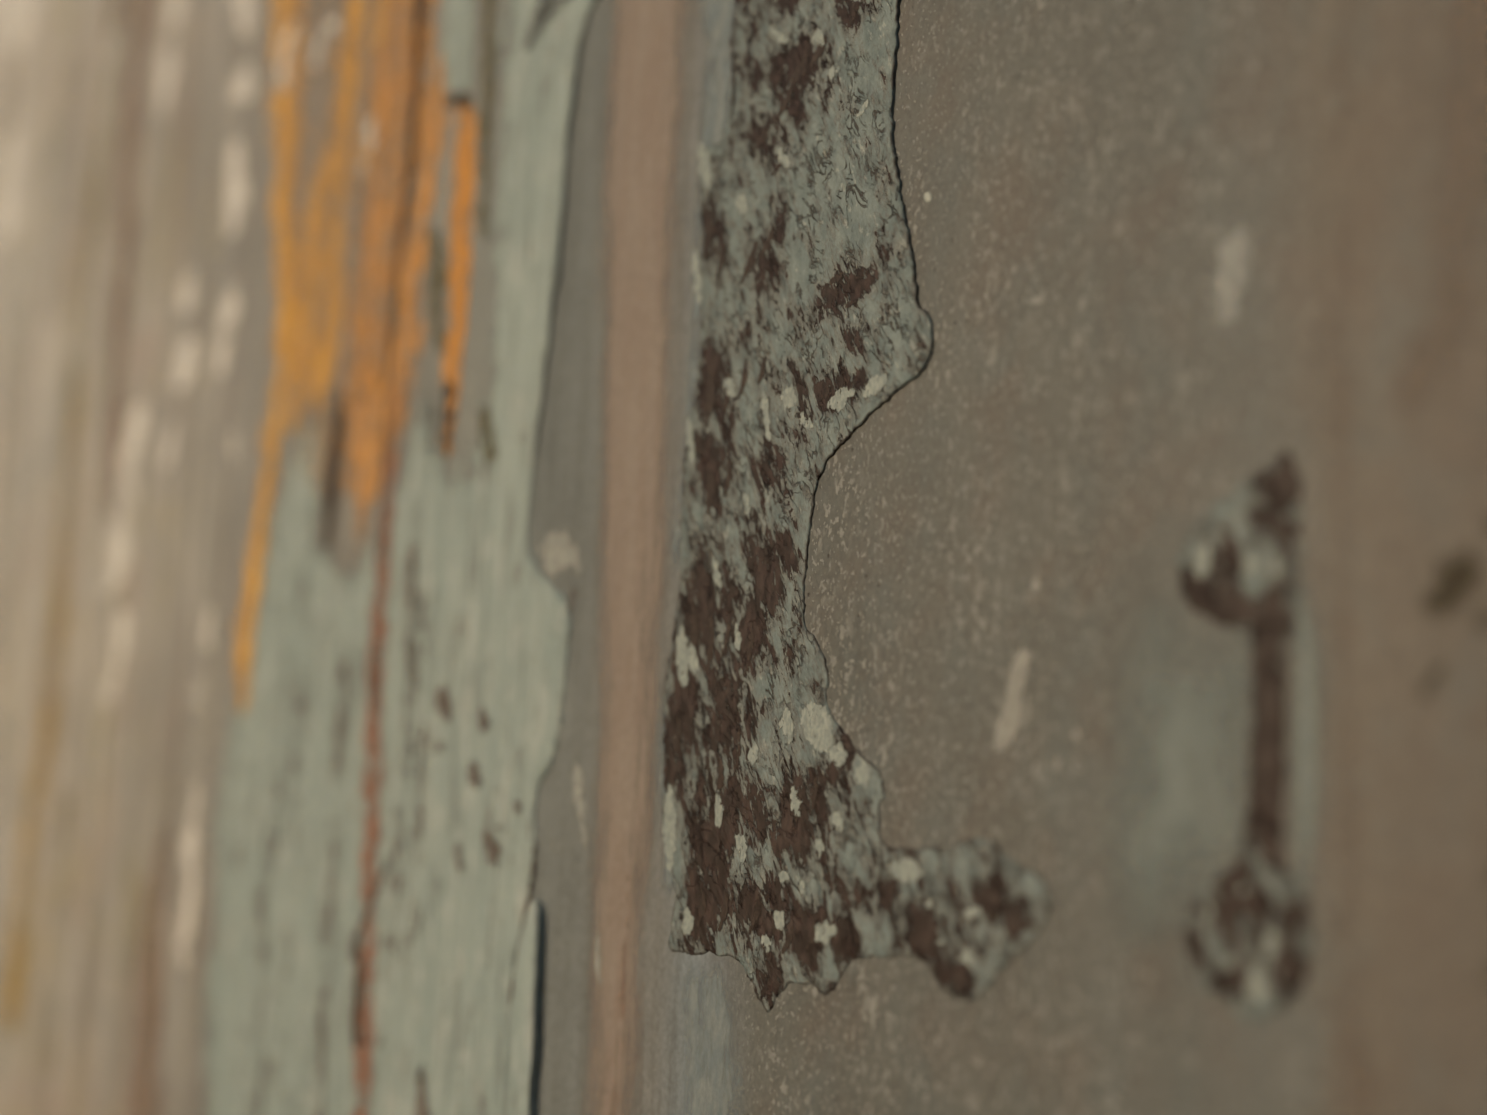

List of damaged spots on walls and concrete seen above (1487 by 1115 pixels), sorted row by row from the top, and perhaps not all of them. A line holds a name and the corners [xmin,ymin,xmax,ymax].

peeling [103,396,148,706]
peeling [170,268,198,394]
peeling [177,0,597,1115]
rust [440,98,478,457]
peeling [660,0,1052,1013]
peeling [1176,452,1315,1023]